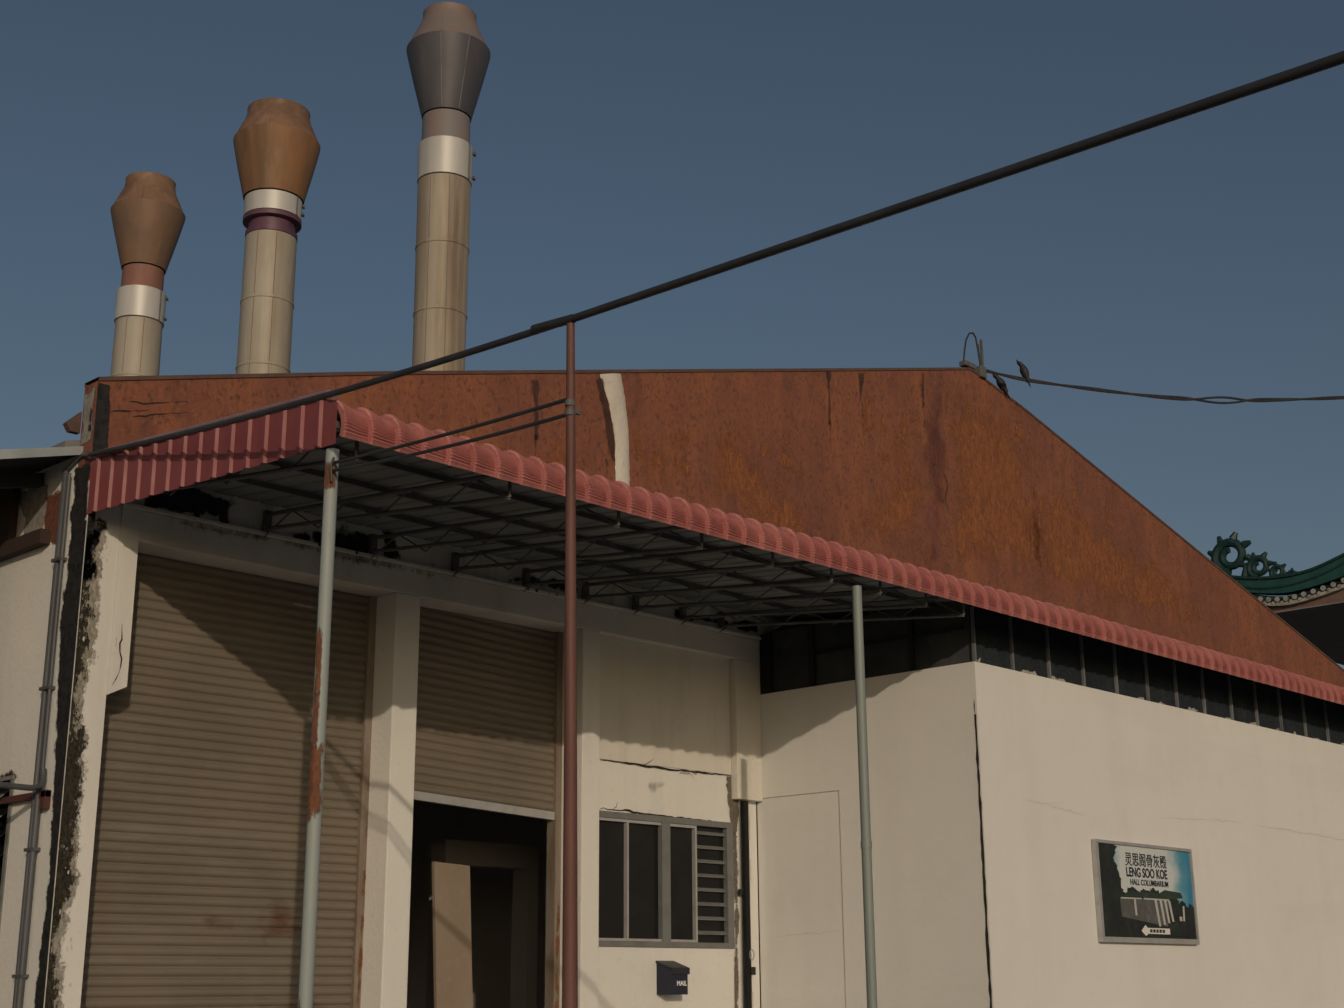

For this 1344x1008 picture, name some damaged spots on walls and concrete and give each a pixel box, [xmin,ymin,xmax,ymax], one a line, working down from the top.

peeling [44,517,108,1008]
crack [112,632,123,685]
rust [307,627,324,821]